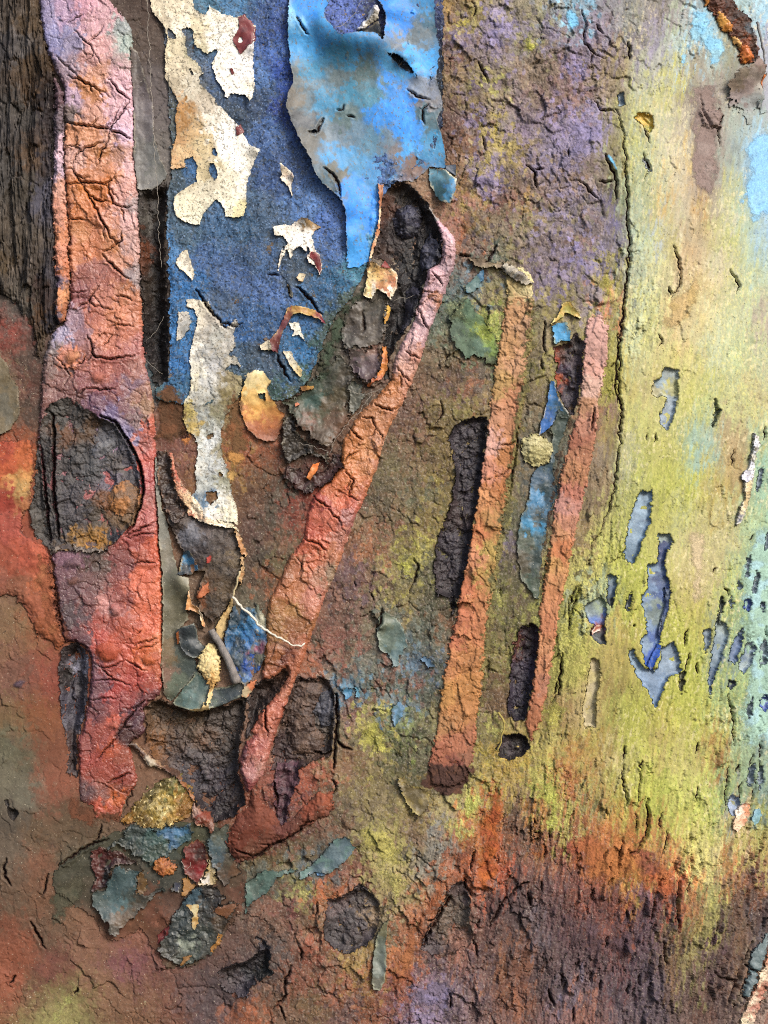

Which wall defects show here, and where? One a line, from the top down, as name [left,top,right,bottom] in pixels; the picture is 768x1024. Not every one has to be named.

rust [703,0,760,65]
crack [55,15,133,394]
spalling [137,182,169,386]
spalling [372,164,457,380]
crack [578,101,650,547]
crack [41,415,60,539]
spalling [29,397,144,551]
crack [101,416,158,565]
peeling [584,490,686,707]
spalling [92,602,336,937]
rust [478,794,501,889]
rust [567,826,675,895]